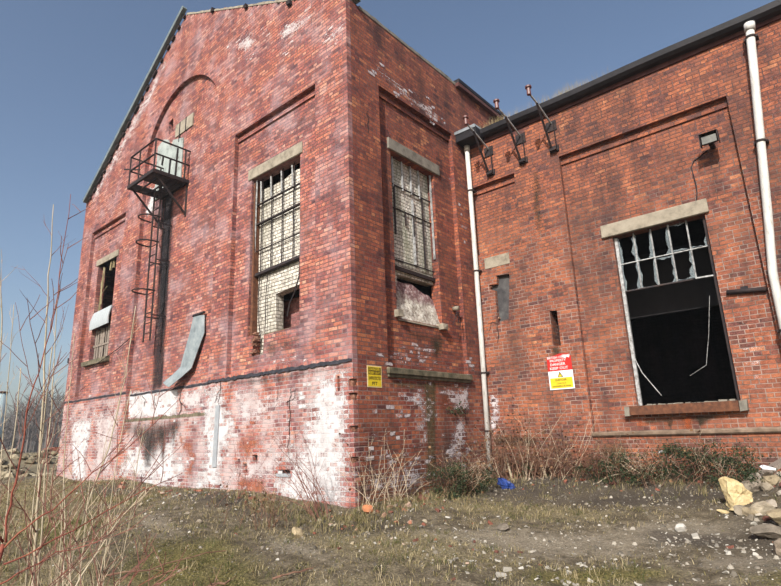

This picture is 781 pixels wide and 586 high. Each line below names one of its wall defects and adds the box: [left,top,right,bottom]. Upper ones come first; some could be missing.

water stain [134,426,174,462]
water stain [402,383,435,478]